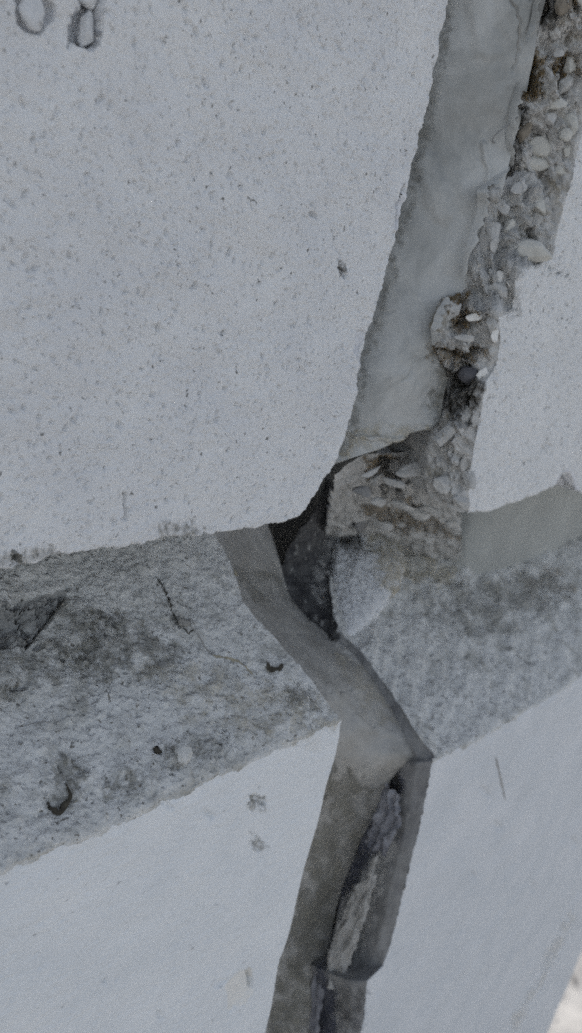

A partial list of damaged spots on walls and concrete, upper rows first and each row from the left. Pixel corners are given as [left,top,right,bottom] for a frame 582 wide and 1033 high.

spalling [14,0,58,34]
spalling [67,0,103,53]
spalling [281,0,582,641]
crack [4,598,80,649]